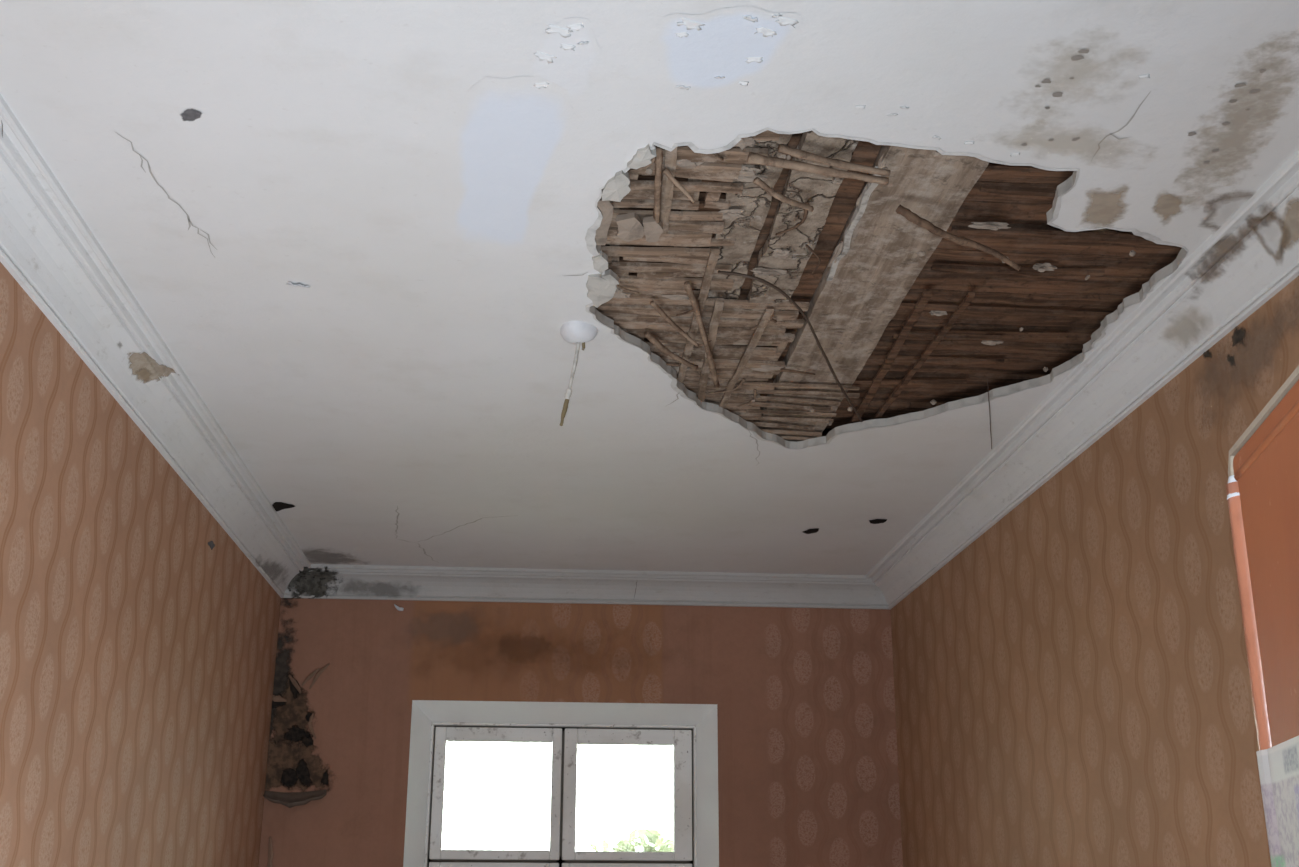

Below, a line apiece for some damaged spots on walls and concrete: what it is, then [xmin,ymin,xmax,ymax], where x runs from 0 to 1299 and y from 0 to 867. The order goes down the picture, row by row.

damp [1035,77,1074,109]
crack [115,132,217,256]
damp [1196,200,1299,281]
flaking render [585,128,1189,450]
peeling [129,352,179,383]
flaking render [265,735,330,792]